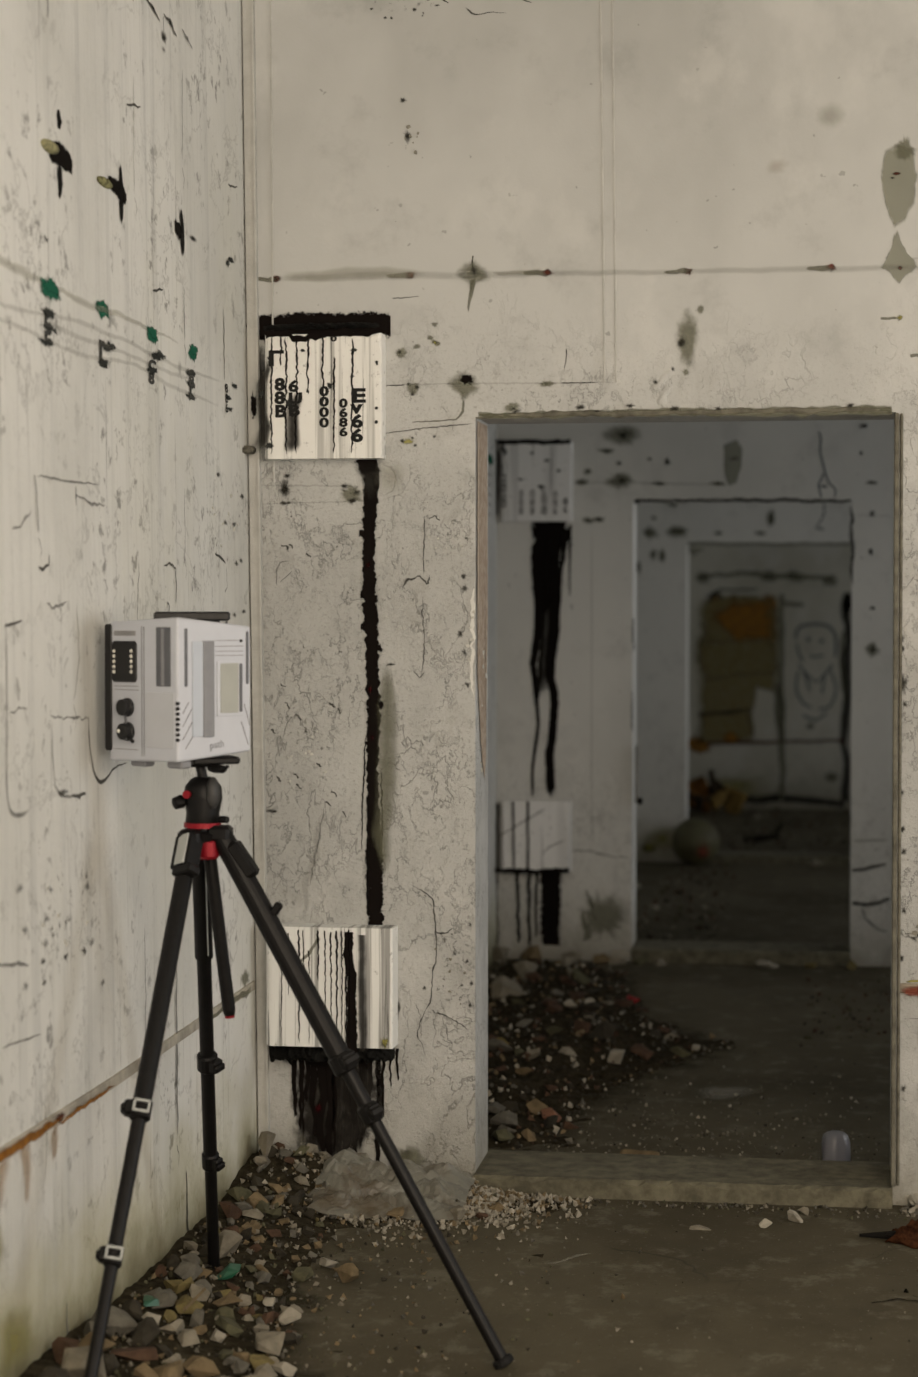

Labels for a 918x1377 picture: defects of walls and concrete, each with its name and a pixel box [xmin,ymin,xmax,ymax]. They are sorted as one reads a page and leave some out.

water stain [401,375,892,808]
water stain [256,459,399,1162]
water stain [495,868,569,945]
rust [904,980,918,996]
rust [0,1086,113,1163]